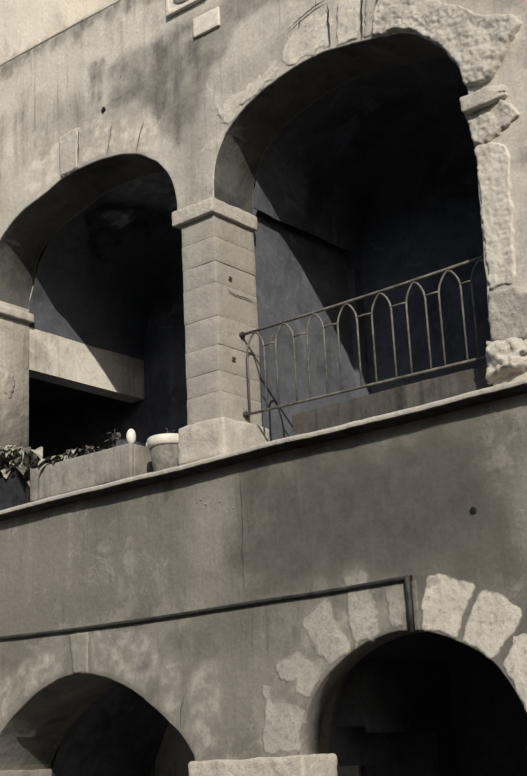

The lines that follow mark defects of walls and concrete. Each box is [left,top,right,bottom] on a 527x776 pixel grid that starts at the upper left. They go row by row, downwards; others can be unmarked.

crack [291,0,331,46]
crack [357,0,365,36]